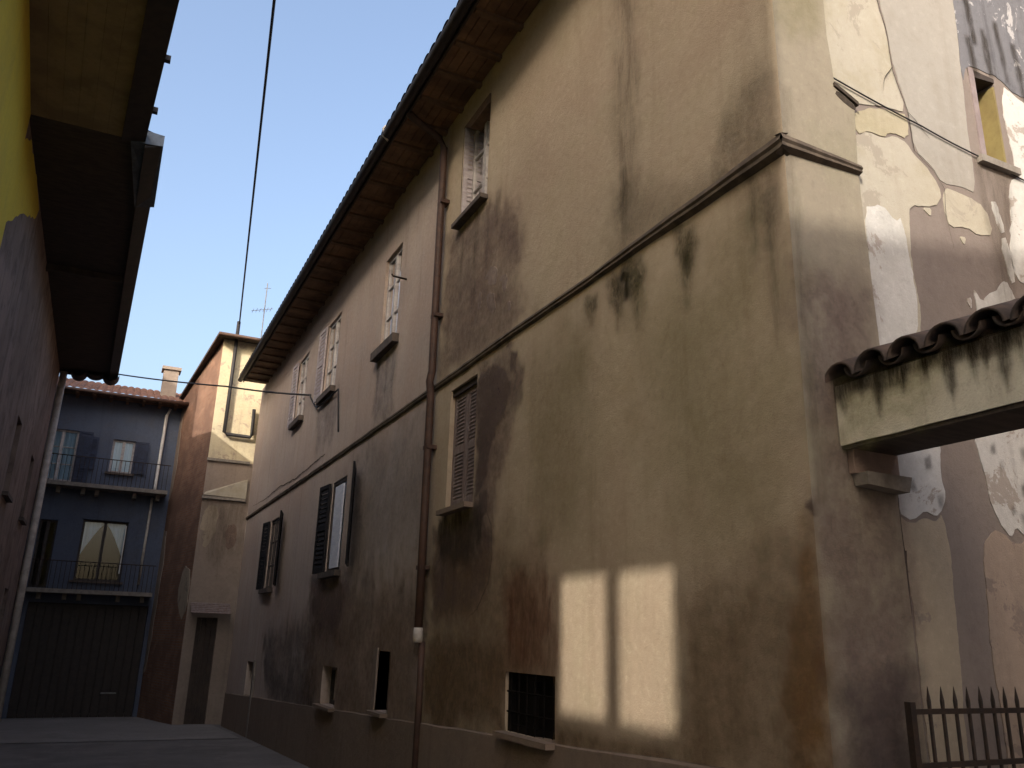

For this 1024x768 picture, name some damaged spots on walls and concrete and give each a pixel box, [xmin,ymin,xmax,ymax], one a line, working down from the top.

damp [679,233,693,277]
crack [877,0,954,245]
damp [822,327,1021,415]
peeling [823,0,1024,345]
peeling [898,447,970,768]
peeling [974,428,1024,768]